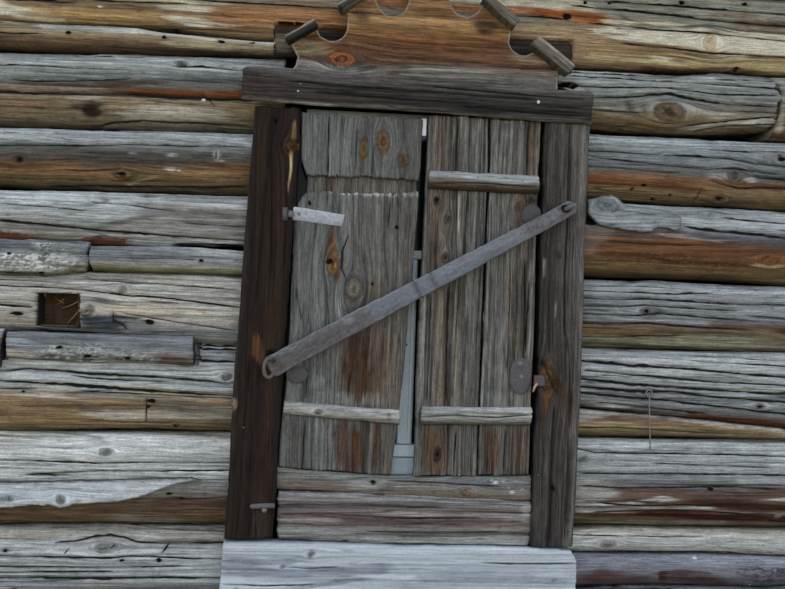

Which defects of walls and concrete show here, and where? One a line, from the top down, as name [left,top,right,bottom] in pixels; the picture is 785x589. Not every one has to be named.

crack [289,71,778,175]
crack [588,149,785,198]
crack [464,183,532,253]
crack [427,291,449,393]
crack [507,218,785,551]
crack [405,440,505,487]
crack [428,415,527,464]
crack [167,497,225,511]
crack [282,504,487,533]
crack [495,560,569,568]